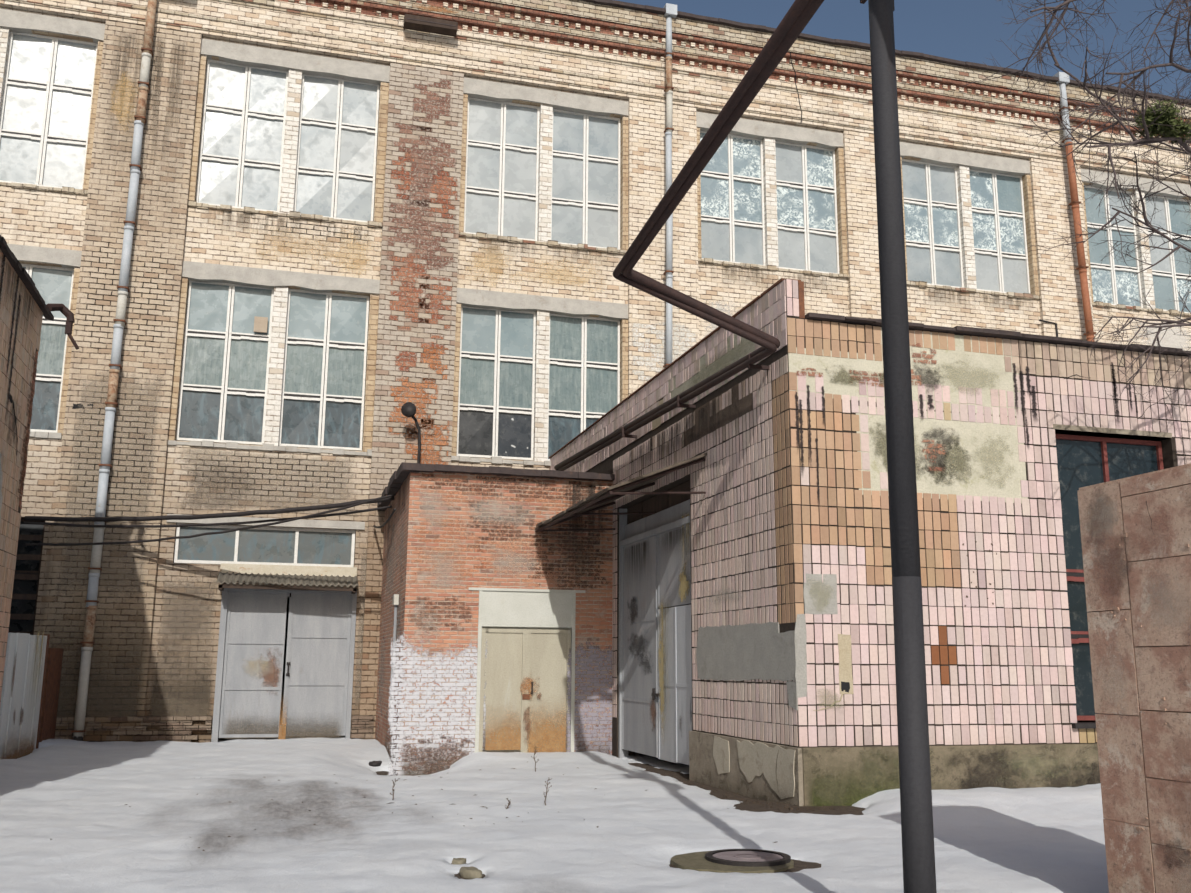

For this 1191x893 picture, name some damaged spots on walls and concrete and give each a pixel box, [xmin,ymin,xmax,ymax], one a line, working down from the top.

spalling [387,79,599,541]
leakage [1012,363,1037,446]
leakage [795,385,825,501]
spalling [409,596,470,630]
corrosion [253,652,279,687]
corrosion [227,717,338,739]
peeling [385,635,487,776]
corrosion [483,678,567,753]
flaking render [713,736,796,799]
leakage [962,753,1019,789]
leakage [1043,763,1101,788]